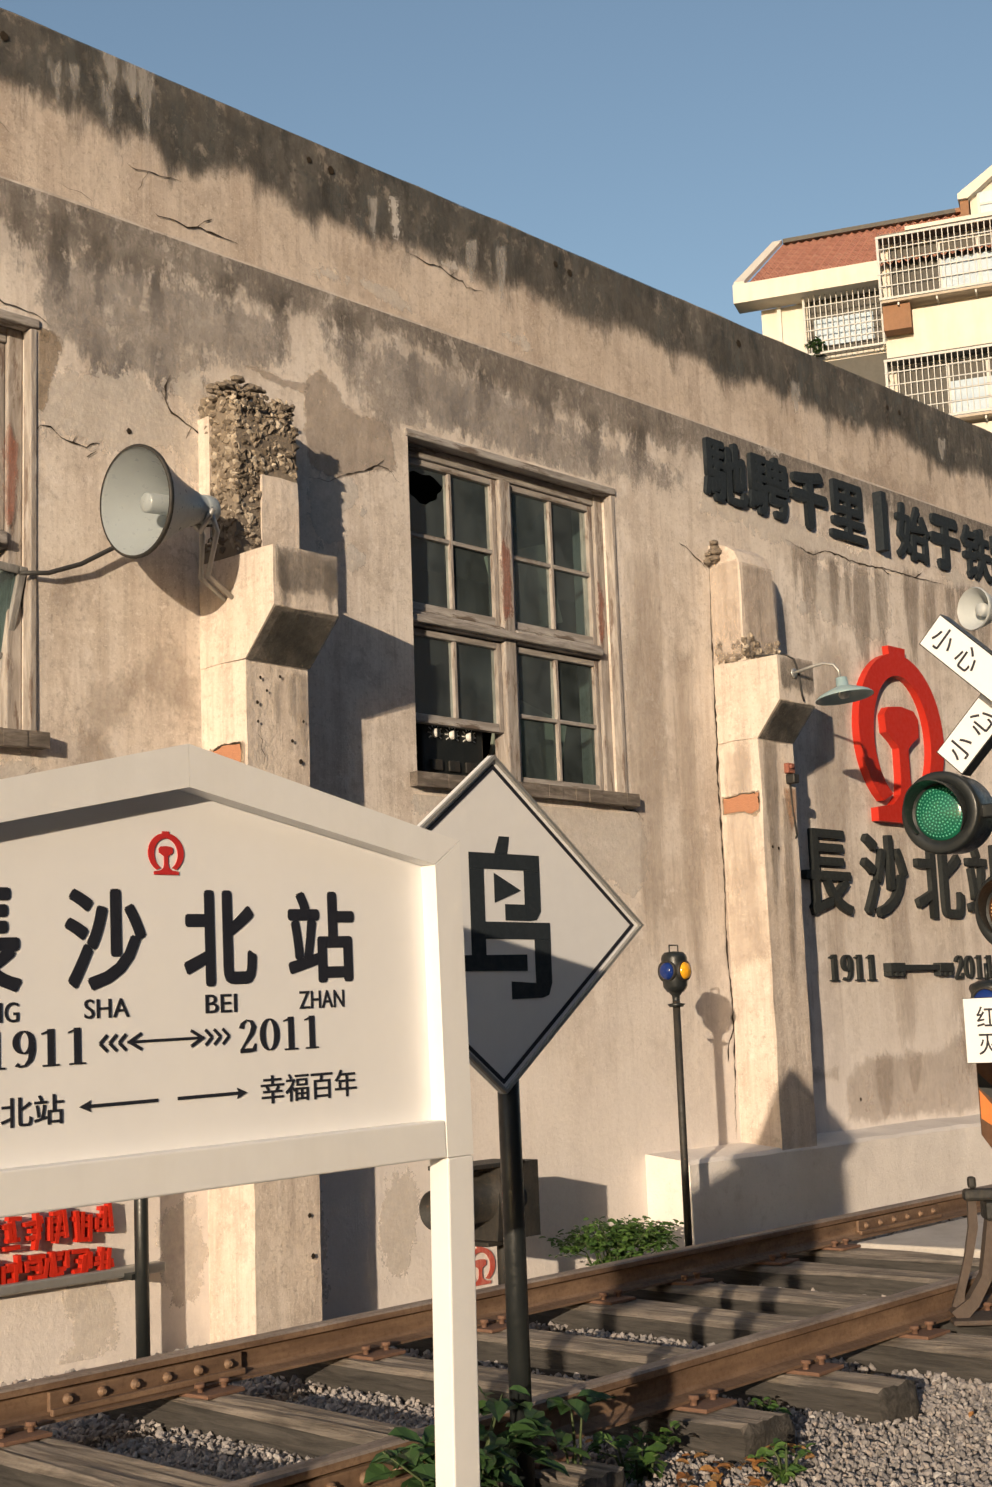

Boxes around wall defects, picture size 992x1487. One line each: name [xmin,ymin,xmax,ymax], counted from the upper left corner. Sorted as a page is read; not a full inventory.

crack [132,167,236,243]
damp [0,8,992,547]
crack [161,376,198,438]
crack [37,425,99,457]
crack [787,540,940,584]
damp [246,547,339,669]
flaking render [209,741,244,763]
flaking render [722,790,760,816]